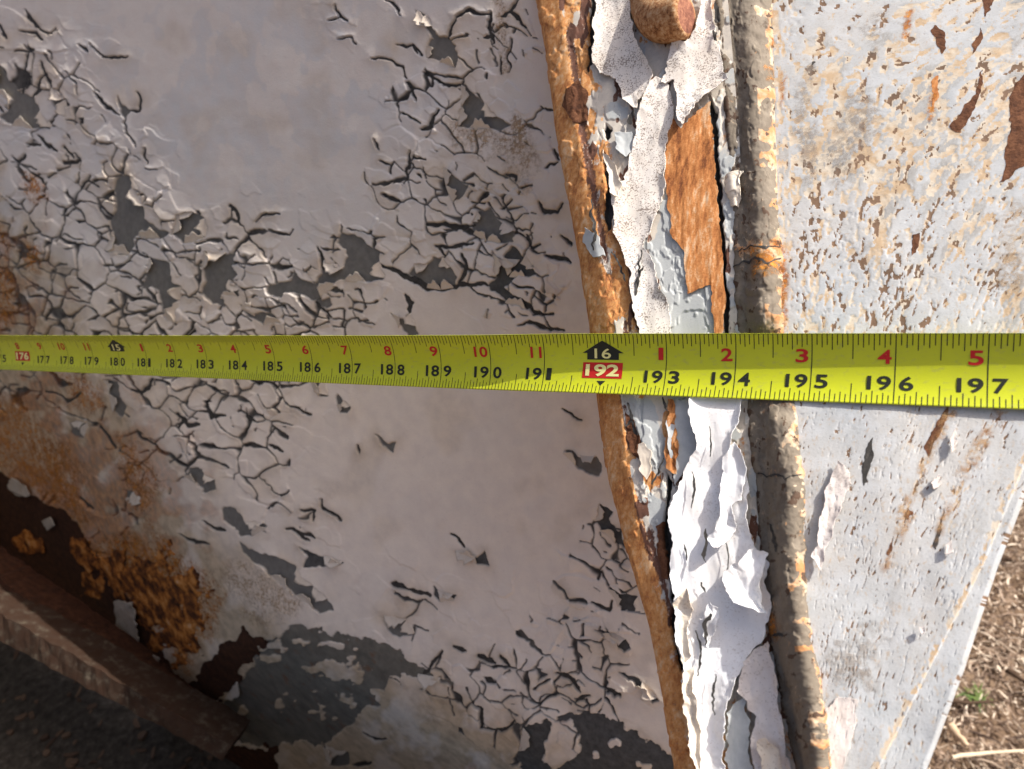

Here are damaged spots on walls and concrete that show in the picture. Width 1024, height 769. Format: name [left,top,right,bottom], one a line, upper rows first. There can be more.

crack [0,10,149,163]
crack [329,6,464,203]
crack [448,0,527,75]
peeling [591,0,744,334]
peeling [999,75,1024,183]
crack [381,221,489,314]
corrosion [749,240,789,327]
corrosion [7,478,30,497]
corrosion [12,517,55,555]
corrosion [69,531,226,681]
peeling [621,397,791,769]
peeling [516,710,674,769]